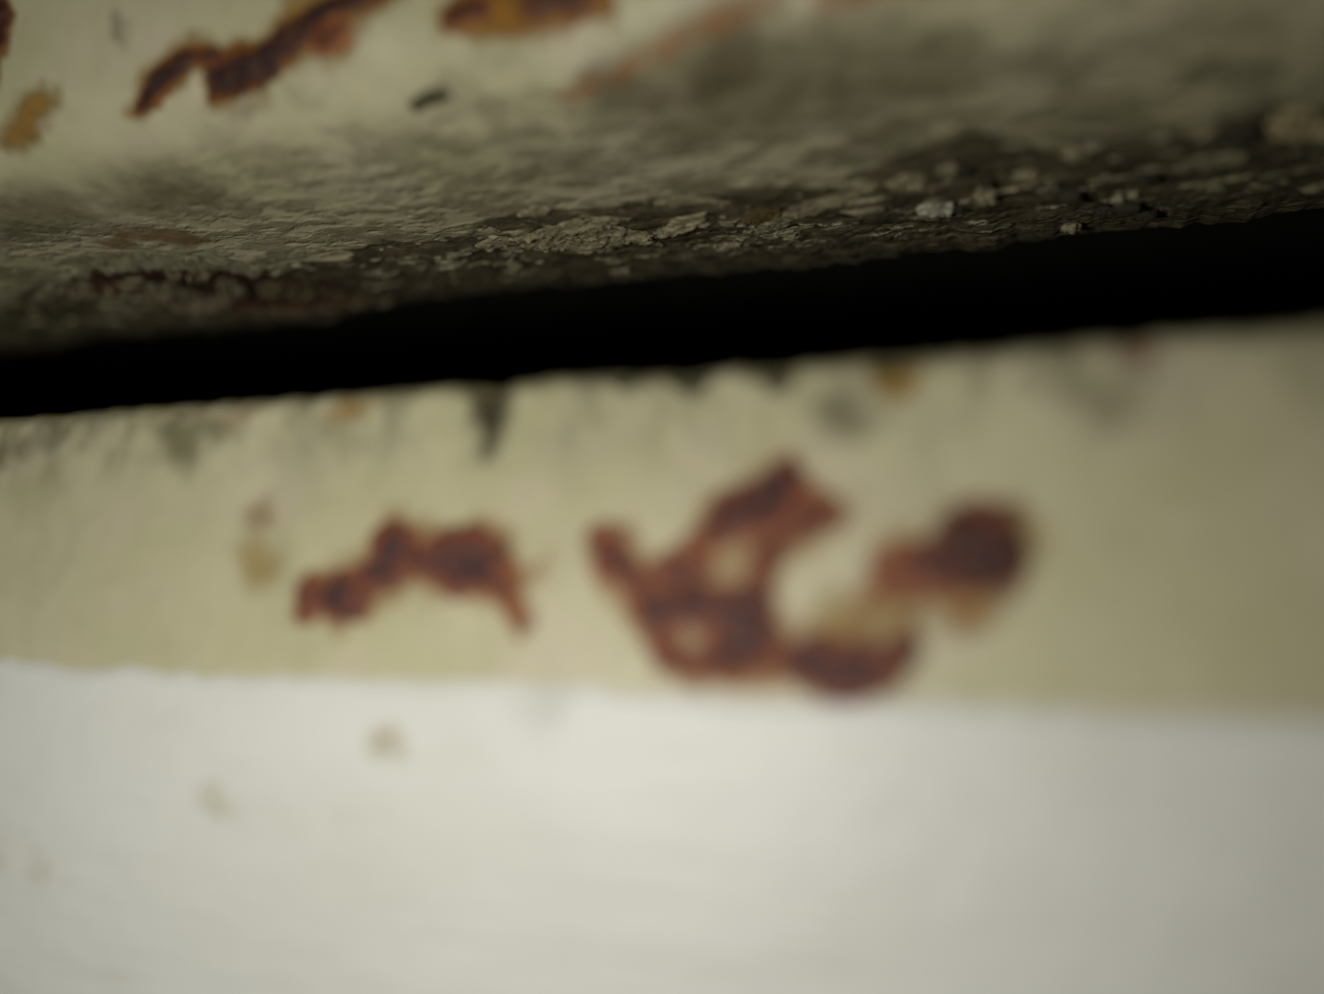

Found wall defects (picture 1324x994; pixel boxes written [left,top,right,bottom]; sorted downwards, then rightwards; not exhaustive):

corrosion [0,0,15,56]
corrosion [127,0,391,117]
corrosion [440,0,616,40]
peeling [475,194,732,272]
peeling [712,161,999,252]
peeling [1056,108,1324,235]
peeling [31,255,467,317]
corrosion [295,519,532,635]
corrosion [586,453,1031,705]